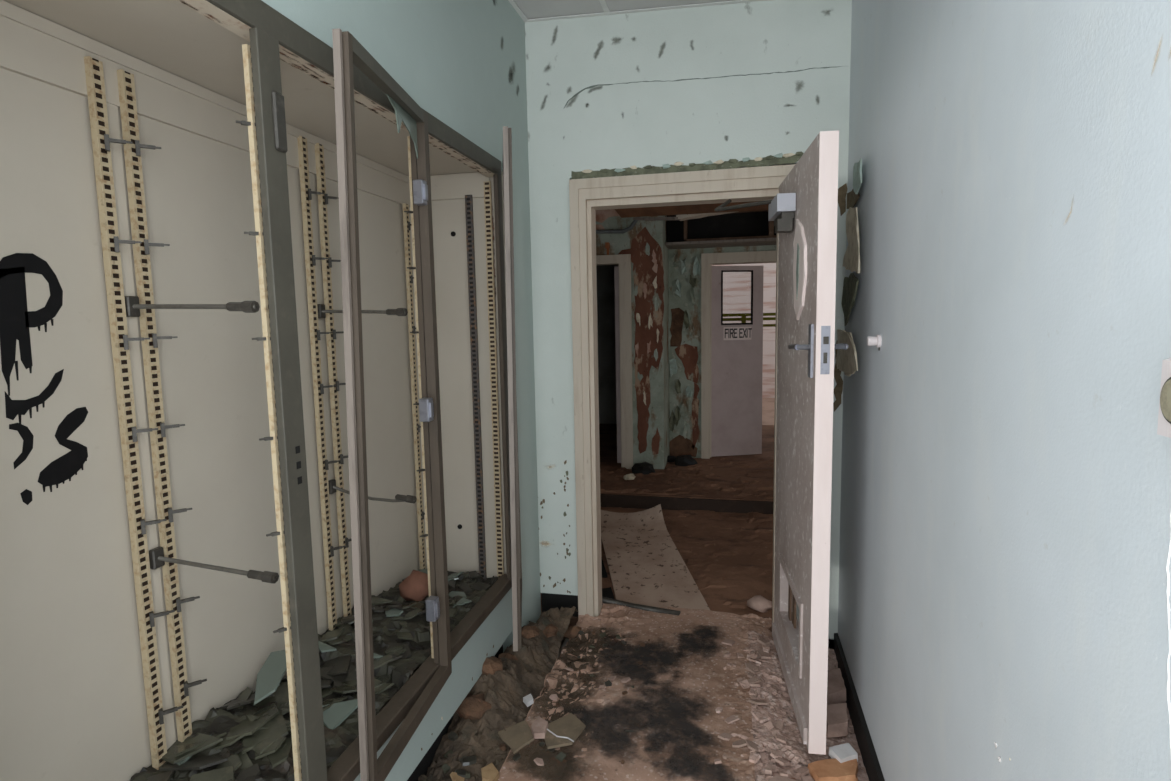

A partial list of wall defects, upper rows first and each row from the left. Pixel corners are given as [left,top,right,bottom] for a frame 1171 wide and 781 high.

peeling [595,209,620,230]
flaking render [617,227,701,457]
peeling [833,158,862,412]
crack [1163,515,1171,751]